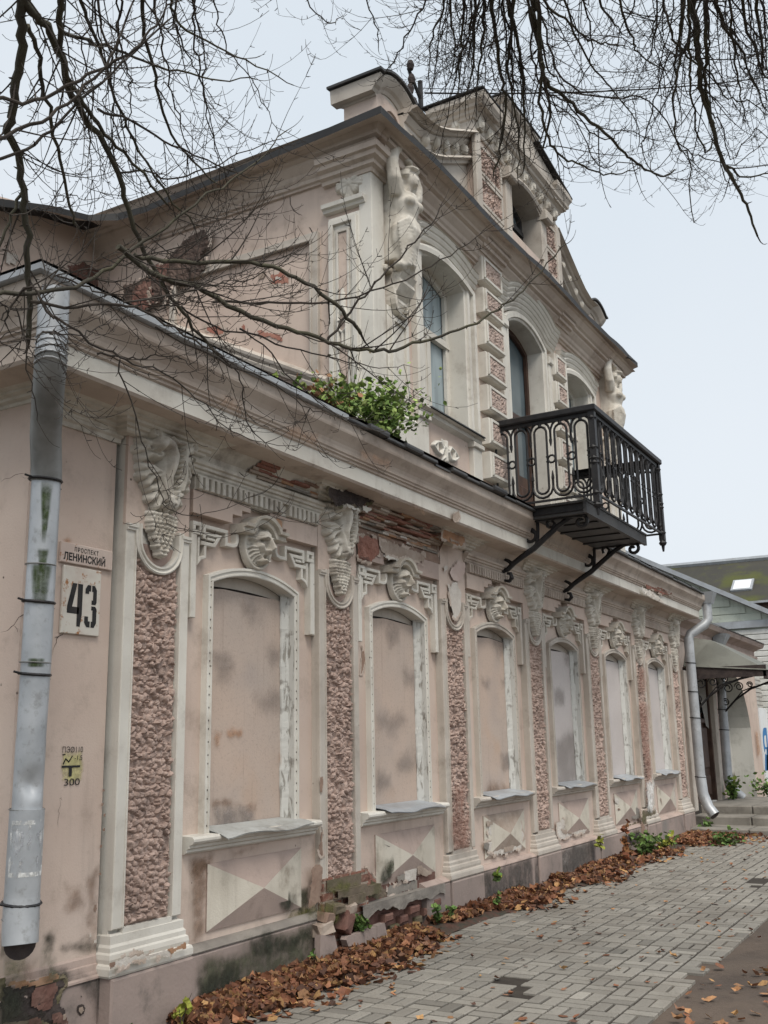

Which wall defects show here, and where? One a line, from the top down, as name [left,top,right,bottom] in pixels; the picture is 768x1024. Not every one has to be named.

spalling [65,259,99,287]
spalling [120,228,212,312]
spalling [248,460,466,621]
spalling [362,865,446,930]
spalling [0,974,86,1024]